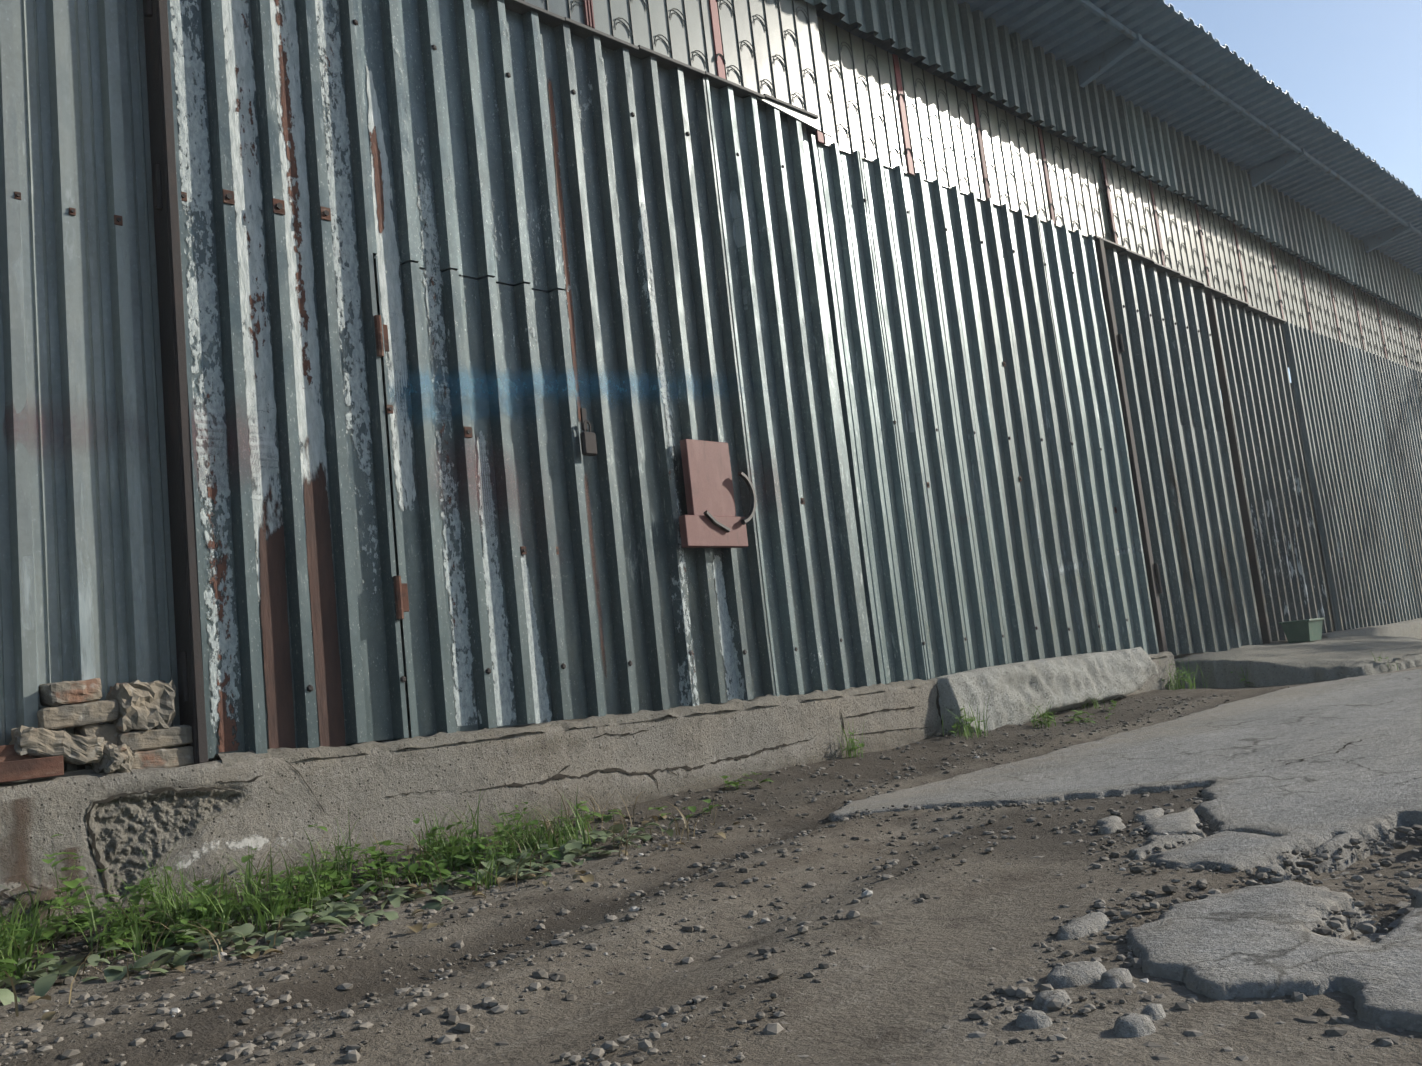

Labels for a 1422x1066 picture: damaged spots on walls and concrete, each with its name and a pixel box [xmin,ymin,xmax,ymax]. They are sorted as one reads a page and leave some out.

spalling [85,775,262,907]
peeling [170,0,241,753]
peeling [222,0,296,749]
peeling [270,0,346,747]
peeling [315,0,380,595]
peeling [366,36,552,726]
peeling [481,124,574,379]
crack [384,685,942,798]
peeling [628,201,748,706]
peeling [1251,469,1326,618]